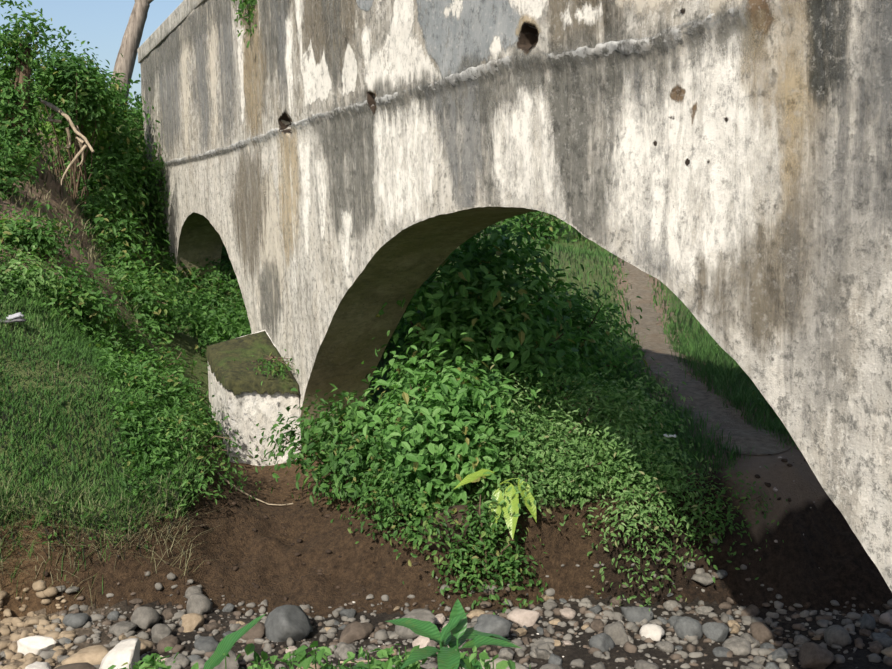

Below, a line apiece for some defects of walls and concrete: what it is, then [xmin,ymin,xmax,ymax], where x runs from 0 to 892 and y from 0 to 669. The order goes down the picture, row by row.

peeling [561,2,603,30]
leakage [688,3,764,87]
leakage [232,148,283,336]
peeling [342,211,353,277]
leakage [144,0,676,244]
peeling [285,0,549,231]
peeling [492,85,566,220]
leakage [638,174,670,272]
corrosion [695,0,814,346]